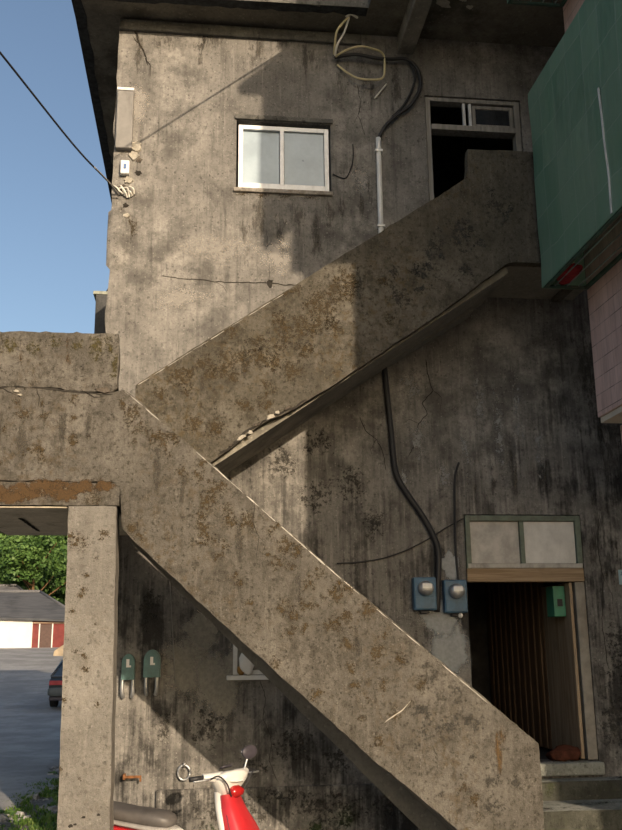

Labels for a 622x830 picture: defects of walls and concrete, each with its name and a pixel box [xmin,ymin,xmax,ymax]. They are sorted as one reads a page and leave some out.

crack [134,31,151,71]
crack [0,386,111,406]
damp [262,446,370,514]